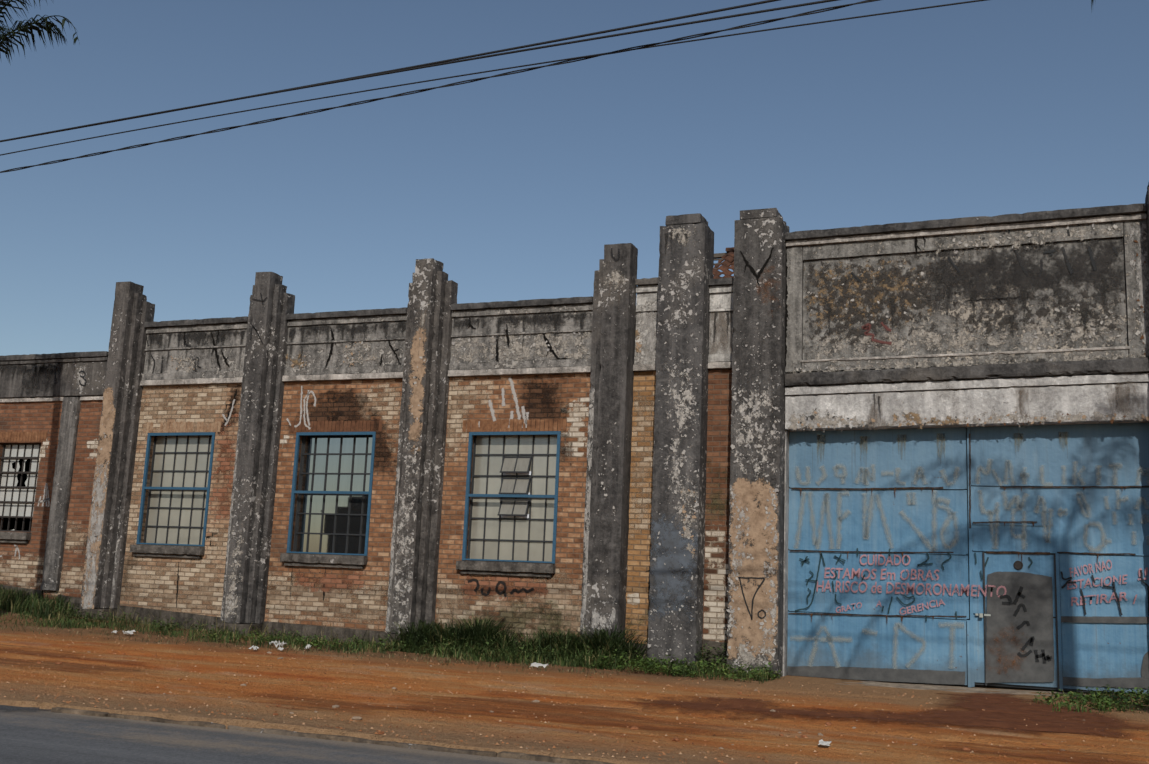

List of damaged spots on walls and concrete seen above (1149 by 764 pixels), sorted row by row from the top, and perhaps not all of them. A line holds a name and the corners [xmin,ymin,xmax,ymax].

flaking render [81,387,116,609]
crack [183,331,237,428]
crack [325,327,336,368]
damp [358,386,399,452]
flaking render [385,327,427,633]
crack [543,333,586,360]
peeling [560,347,701,665]
peeling [635,259,702,356]
flaking render [727,286,875,671]
mould [803,238,1127,360]
flaking render [793,222,1149,373]
flaking render [892,409,1149,429]